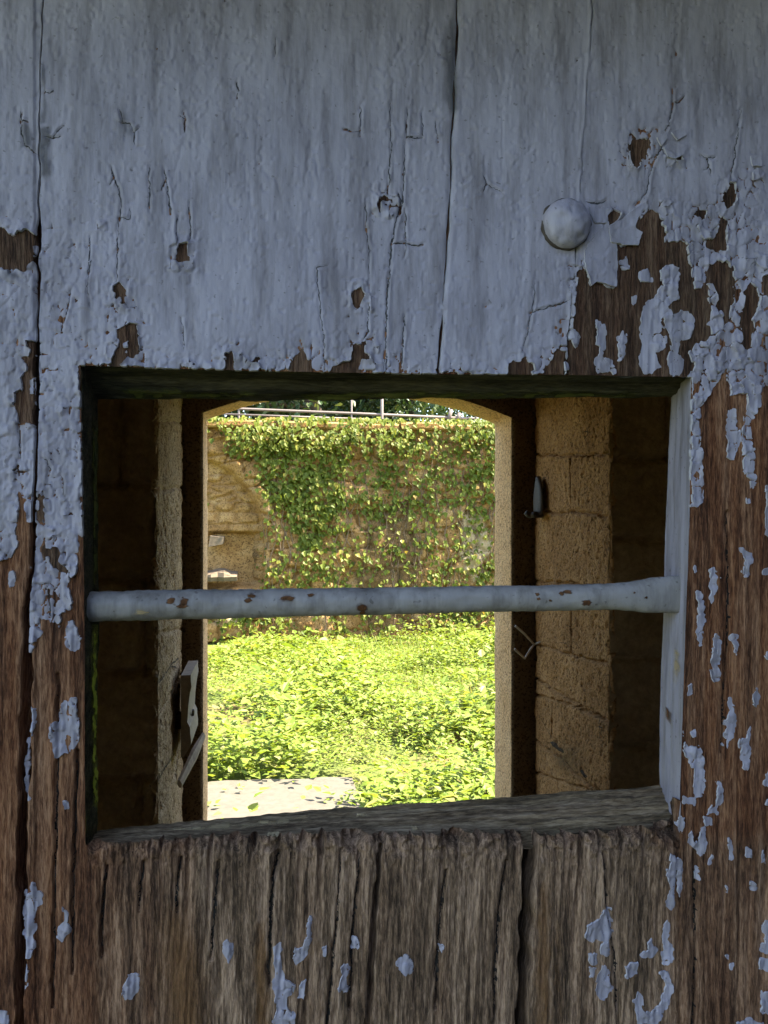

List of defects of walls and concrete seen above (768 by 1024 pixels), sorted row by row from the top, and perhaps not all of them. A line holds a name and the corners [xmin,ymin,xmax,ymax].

peeling [627,137,650,168]
peeling [0,227,42,272]
peeling [175,243,190,262]
peeling [508,154,768,377]
peeling [113,282,126,306]
peeling [351,287,365,309]
peeling [111,322,142,367]
peeling [288,349,313,372]
peeling [327,339,369,373]
peeling [13,341,42,428]
rust [166,597,188,608]
peeling [0,369,768,1024]